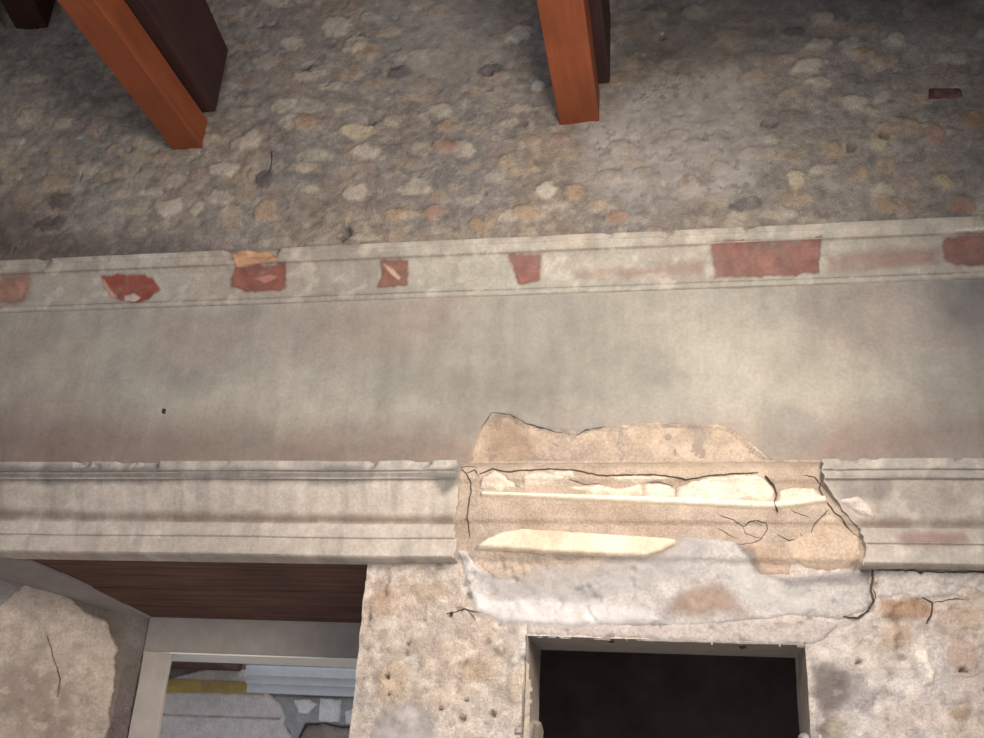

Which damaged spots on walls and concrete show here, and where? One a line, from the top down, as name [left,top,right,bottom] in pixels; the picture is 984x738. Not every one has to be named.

spalling [472,415,820,501]
crack [461,412,859,545]
spalling [741,515,861,575]
flaking render [841,497,875,519]
crack [843,569,984,623]
flaking render [0,585,139,738]